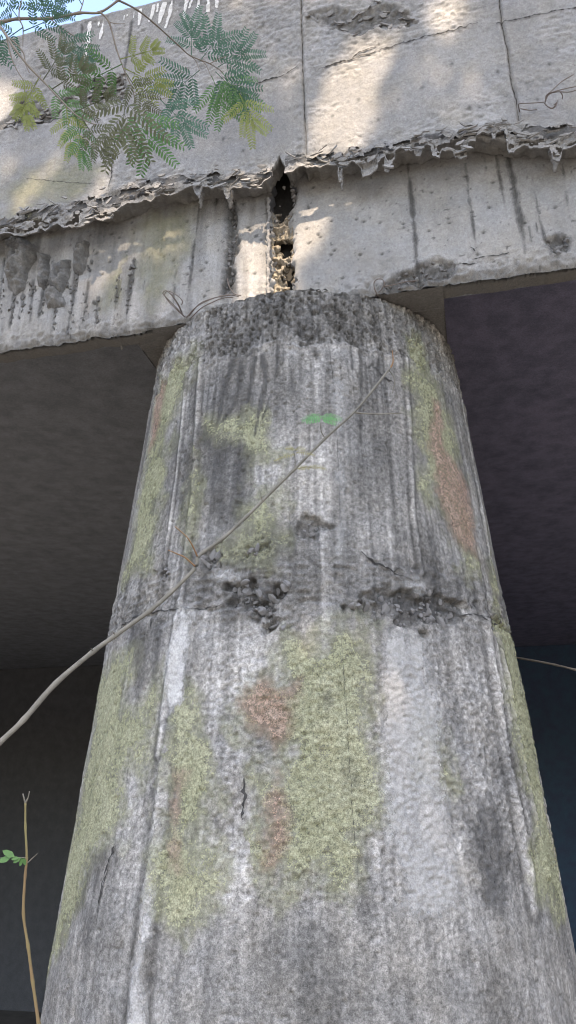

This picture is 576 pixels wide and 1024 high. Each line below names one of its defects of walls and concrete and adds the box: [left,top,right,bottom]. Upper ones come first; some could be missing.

flaking render [0,117,576,295]
crack [329,346,416,584]
rust [431,402,474,550]
rust [244,682,290,739]
crack [239,778,247,820]